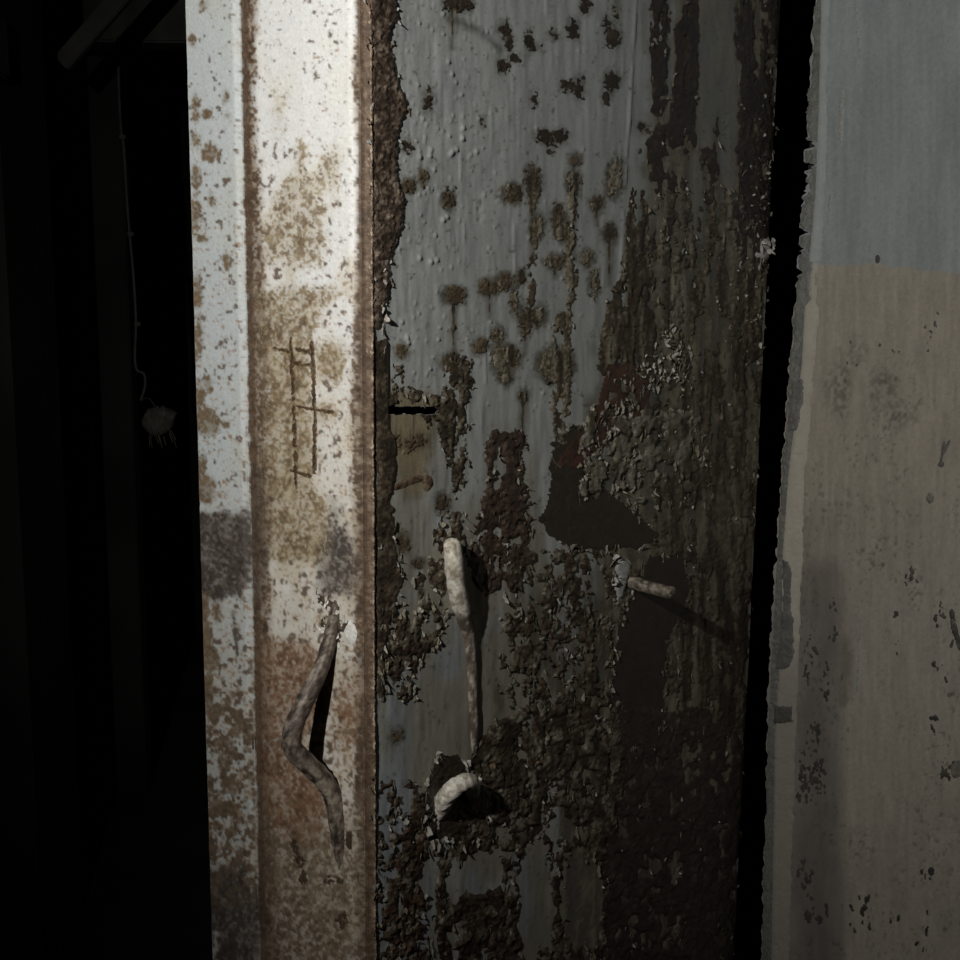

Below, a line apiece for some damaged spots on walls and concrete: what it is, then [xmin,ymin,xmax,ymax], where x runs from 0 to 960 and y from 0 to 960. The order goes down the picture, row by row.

rust [190,98,212,121]
rust [191,133,222,242]
peeling [755,237,776,271]
rust [193,280,203,362]
peeling [381,305,391,354]
rust [196,0,780,960]
spalling [538,363,715,754]